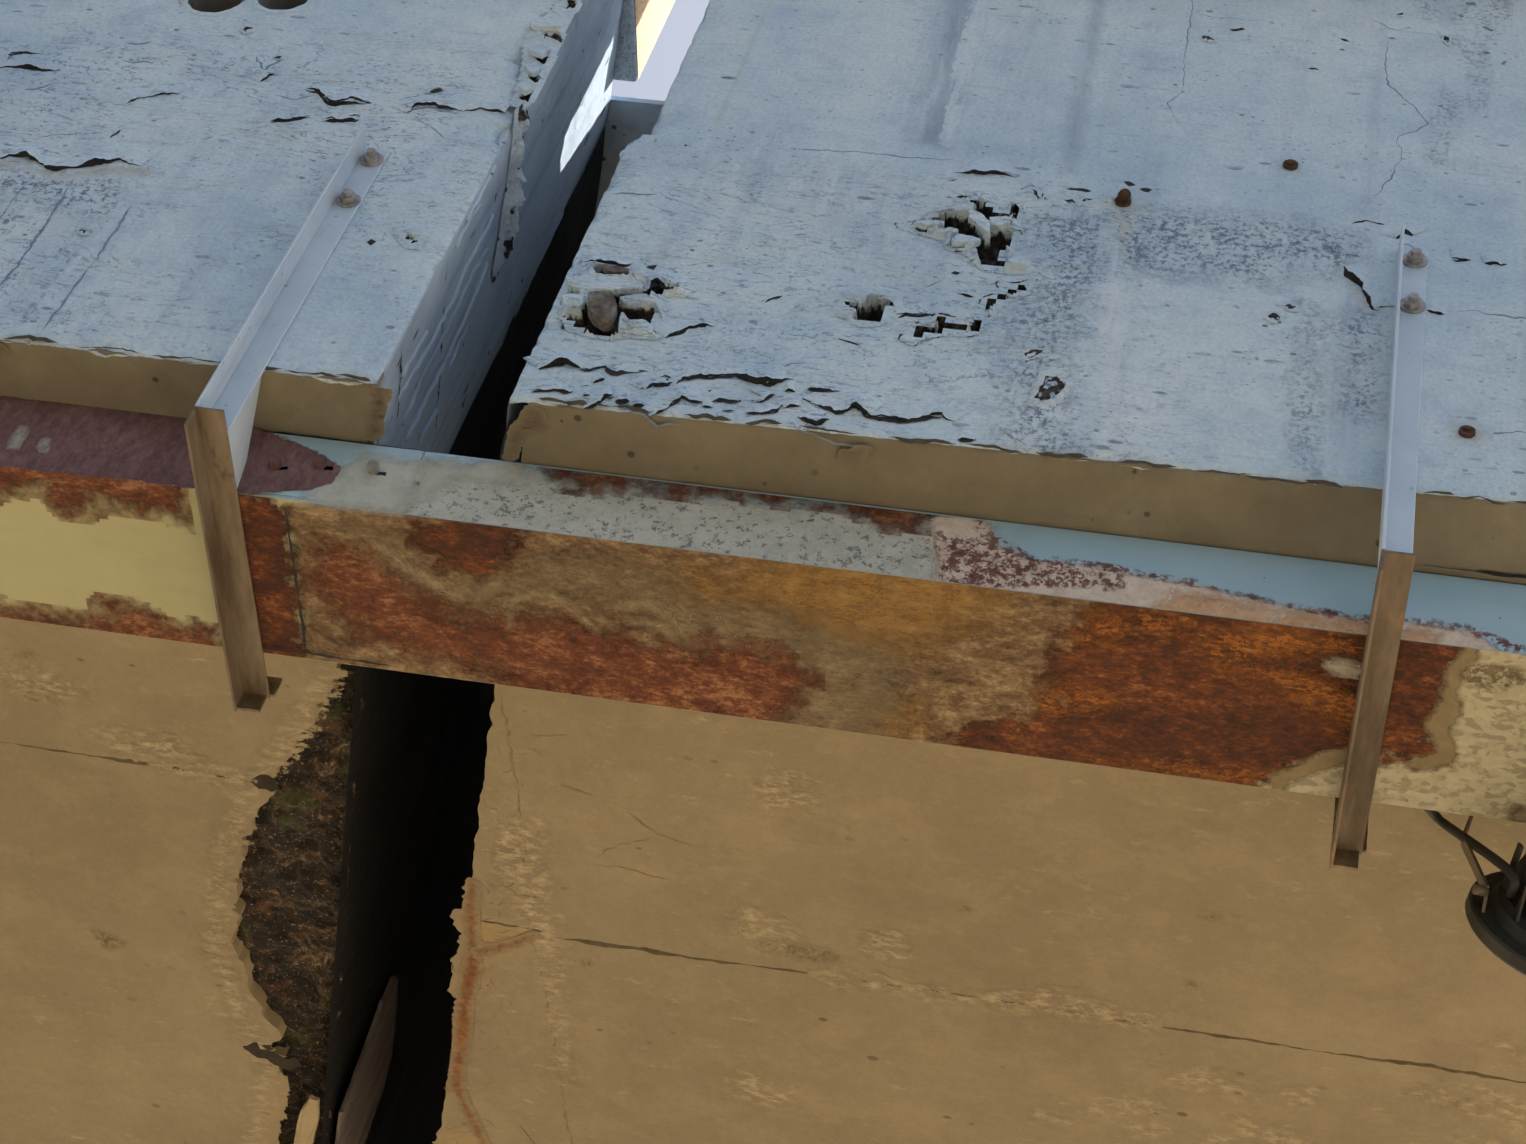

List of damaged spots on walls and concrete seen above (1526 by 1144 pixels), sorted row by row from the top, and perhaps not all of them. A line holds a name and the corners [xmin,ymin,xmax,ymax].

crack [0,41,182,171]
crack [249,56,510,139]
spalling [492,0,583,282]
crack [1308,20,1526,319]
peeling [0,396,195,489]
peeling [237,426,340,495]
rust [502,405,551,461]
spalling [523,182,1393,488]
rust [238,467,1370,790]
rust [1378,619,1526,772]
rust [432,877,551,1144]
crack [443,686,1526,1144]